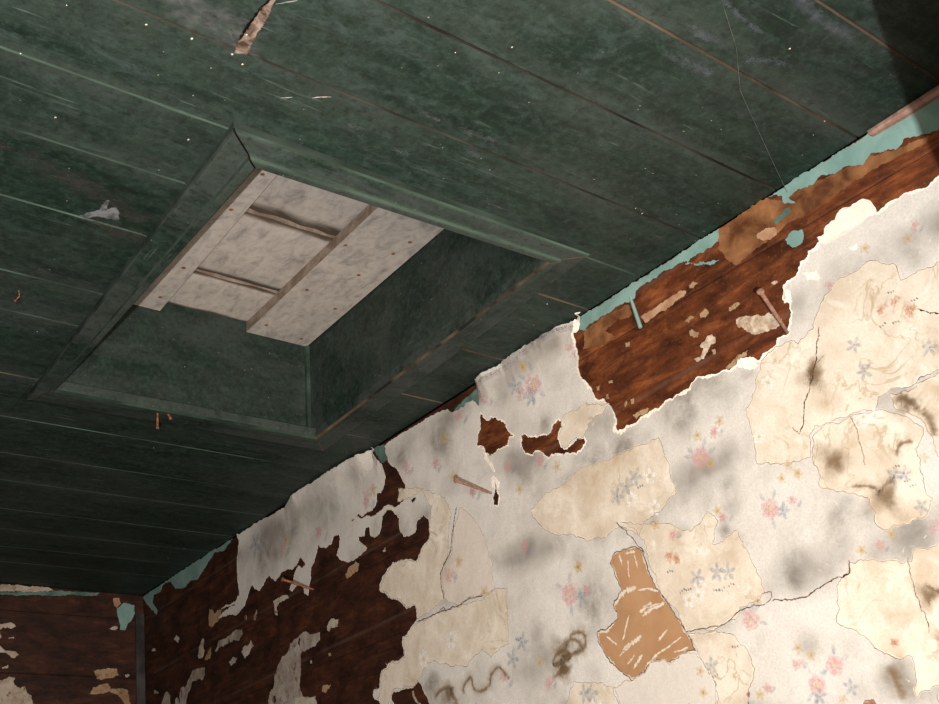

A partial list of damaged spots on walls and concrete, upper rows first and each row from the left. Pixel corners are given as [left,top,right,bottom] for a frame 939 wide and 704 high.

peeling [571,98,939,435]
peeling [454,389,587,507]
peeling [0,445,430,704]
crack [417,507,482,622]
crack [686,561,850,632]